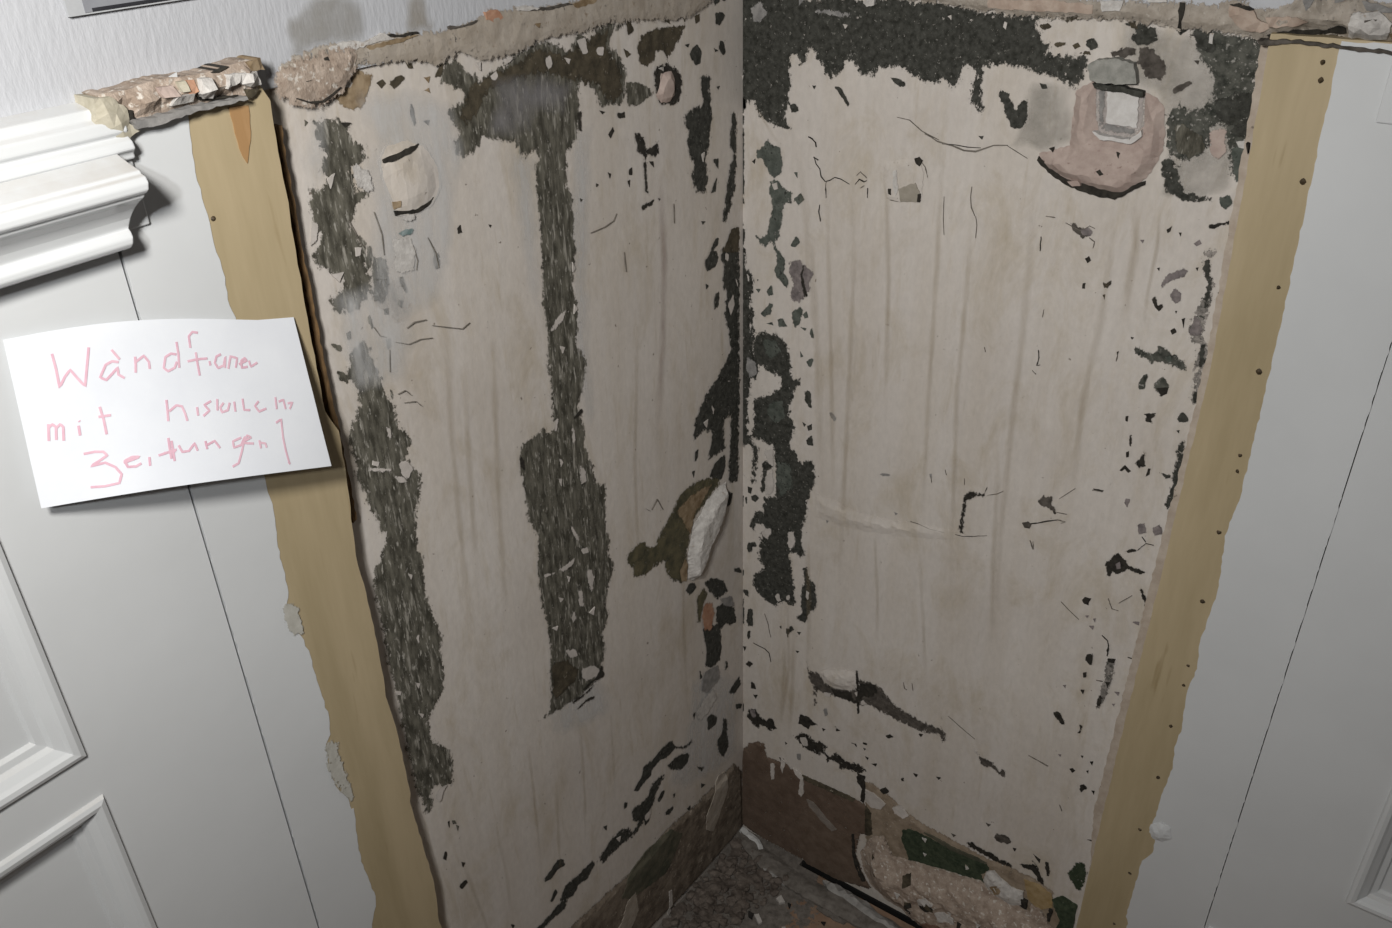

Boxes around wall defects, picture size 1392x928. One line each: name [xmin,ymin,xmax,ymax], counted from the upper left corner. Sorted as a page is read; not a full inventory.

peeling [325,740,354,801]
peeling [331,331,454,814]
peeling [74,0,726,719]
peeling [538,0,1392,928]